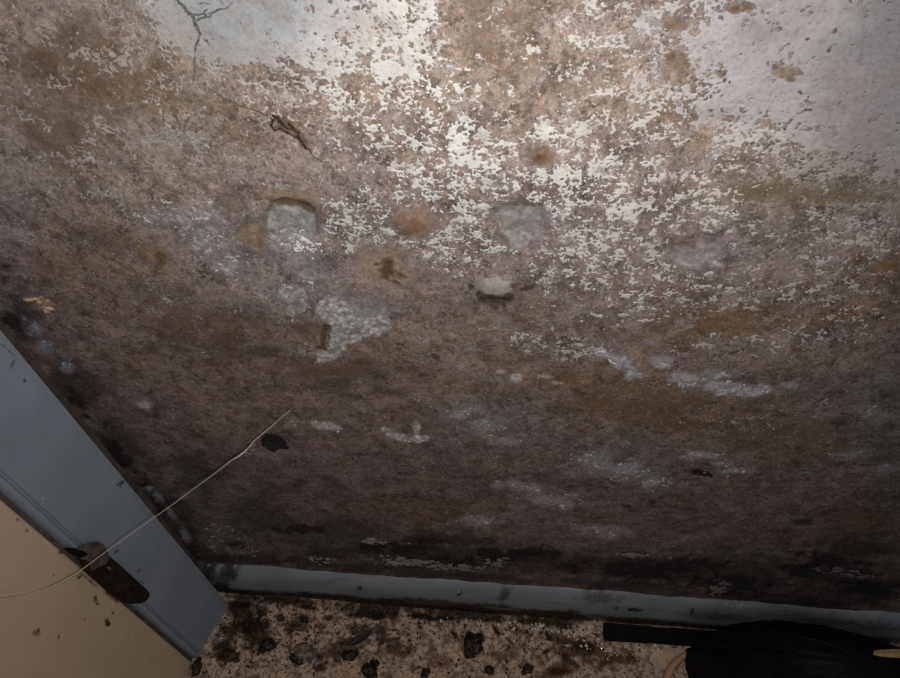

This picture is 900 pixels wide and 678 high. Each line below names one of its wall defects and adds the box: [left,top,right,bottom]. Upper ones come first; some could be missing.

crack [177,0,332,165]
efflorescence [127,195,240,281]
peeling [0,0,900,481]
damp [2,296,55,351]
efflorescence [277,256,392,363]
efflorescence [592,346,642,380]
efflorescence [650,357,772,397]
efflorescence [311,420,341,433]
efflorescence [381,421,430,443]
efflorescence [570,452,673,488]
damp [680,452,745,477]
damp [138,480,900,627]